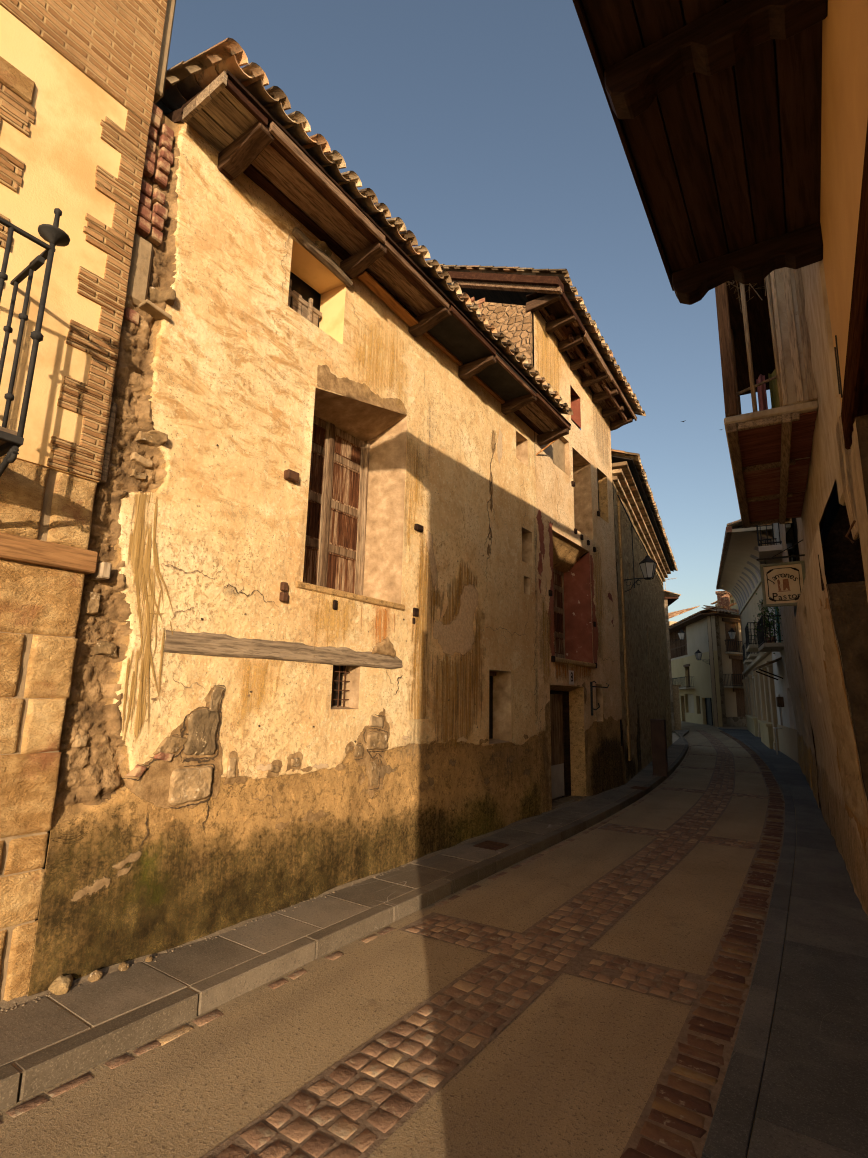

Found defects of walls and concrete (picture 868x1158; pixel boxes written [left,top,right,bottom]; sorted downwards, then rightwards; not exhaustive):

flaking render [130,430,168,480]
crack [484,431,526,578]
flaking render [84,591,101,615]
flaking render [71,733,87,748]
spalling [120,685,247,809]
spalling [335,709,410,799]